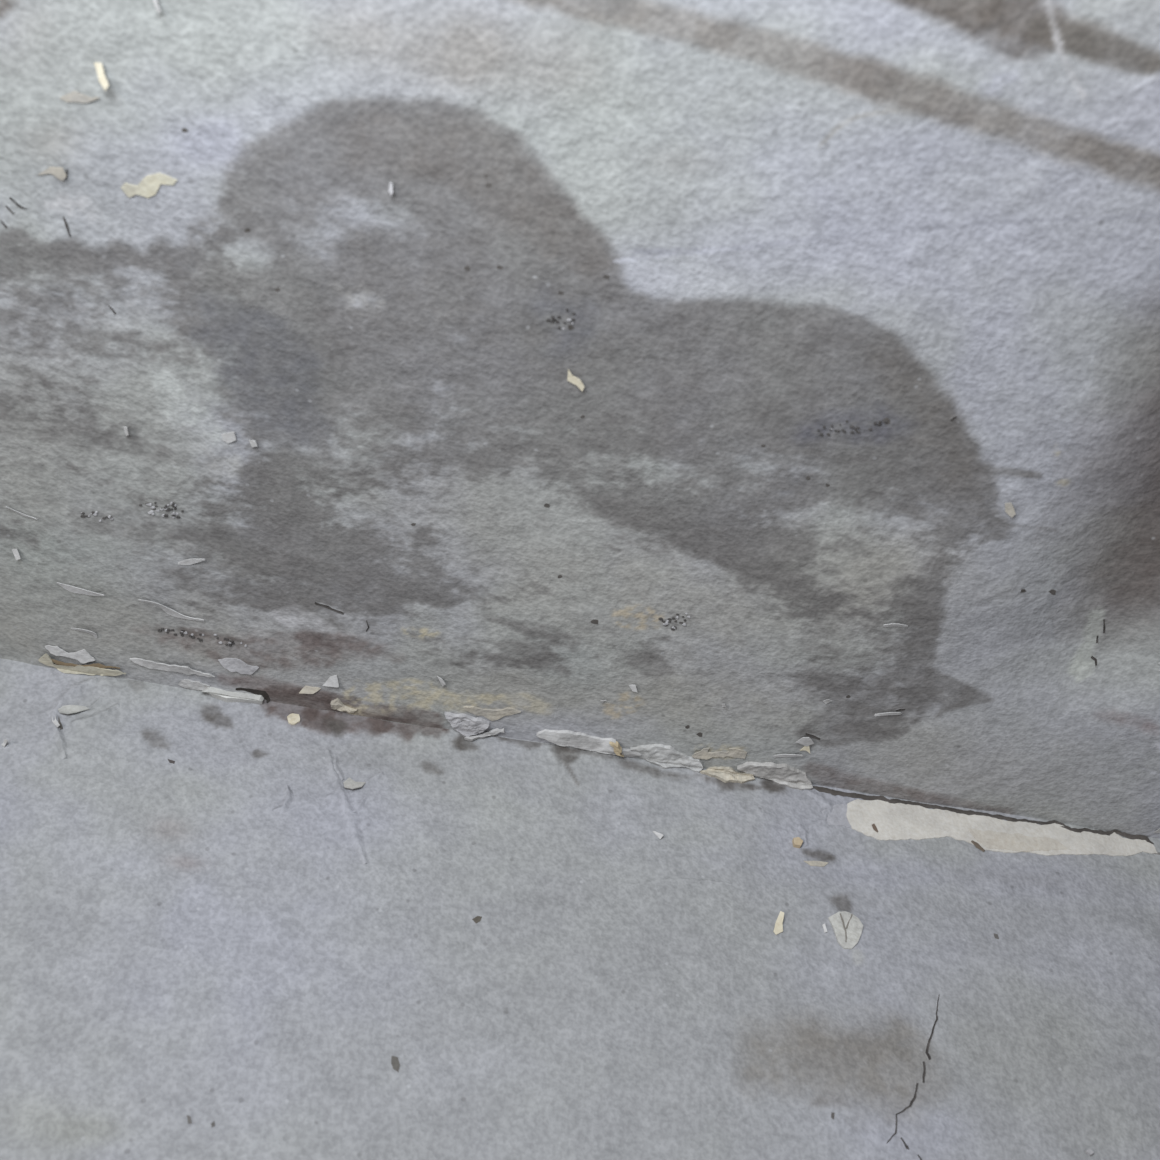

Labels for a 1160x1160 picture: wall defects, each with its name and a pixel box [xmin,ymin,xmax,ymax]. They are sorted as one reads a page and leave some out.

leakage [0,0,25,38]
leakage [490,0,1160,200]
leakage [0,90,1160,753]
peeling [38,645,126,759]
peeling [218,658,259,675]
peeling [287,713,300,725]
peeling [299,675,339,694]
peeling [796,737,814,753]
crack [813,786,1160,855]
peeling [821,799,1157,856]
crack [886,995,940,1160]